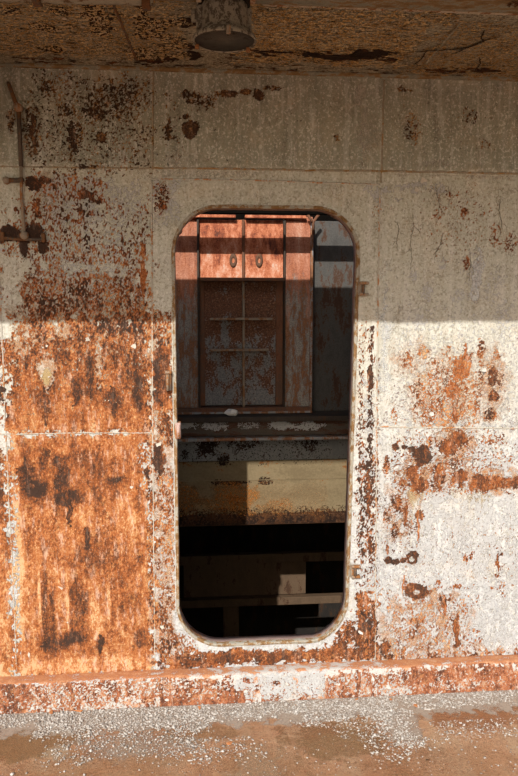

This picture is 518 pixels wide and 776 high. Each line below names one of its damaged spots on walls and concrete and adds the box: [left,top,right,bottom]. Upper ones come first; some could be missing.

corrosion [0,0,205,69]
crack [305,49,383,60]
corrosion [213,4,518,78]
crack [414,30,500,70]
corrosion [0,68,518,677]
corrosion [0,662,518,714]